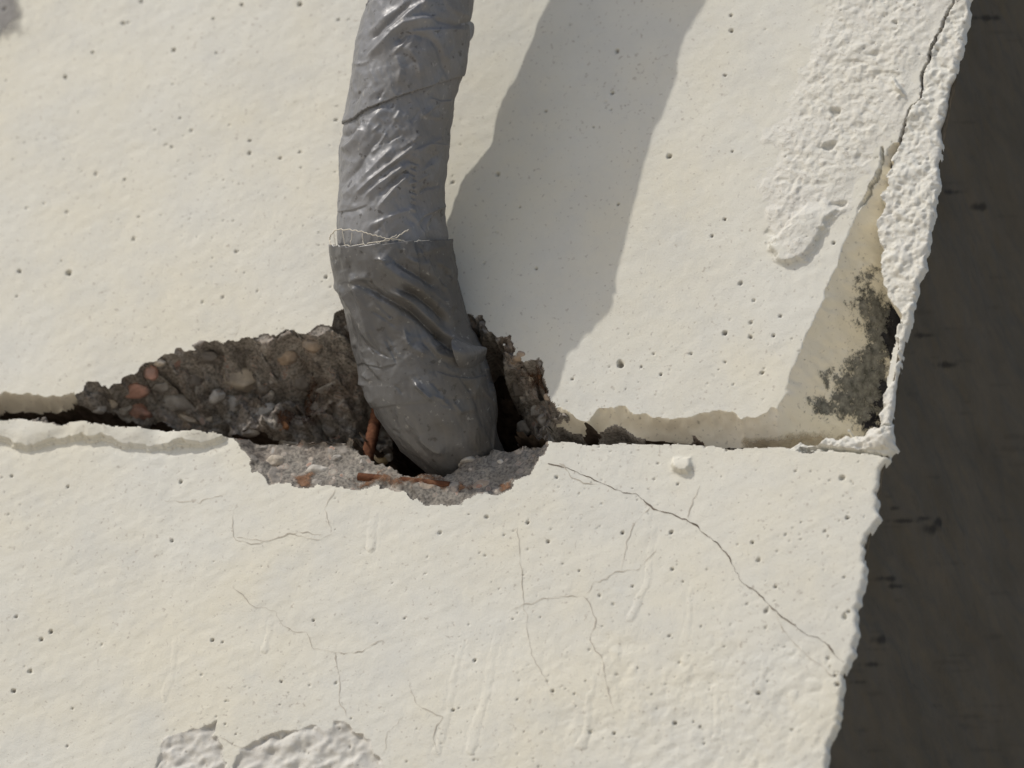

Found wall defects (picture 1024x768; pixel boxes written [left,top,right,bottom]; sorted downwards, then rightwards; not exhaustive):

spalling [0,308,778,507]
corrosion [357,408,473,492]
water stain [807,265,901,436]
crack [514,463,845,710]